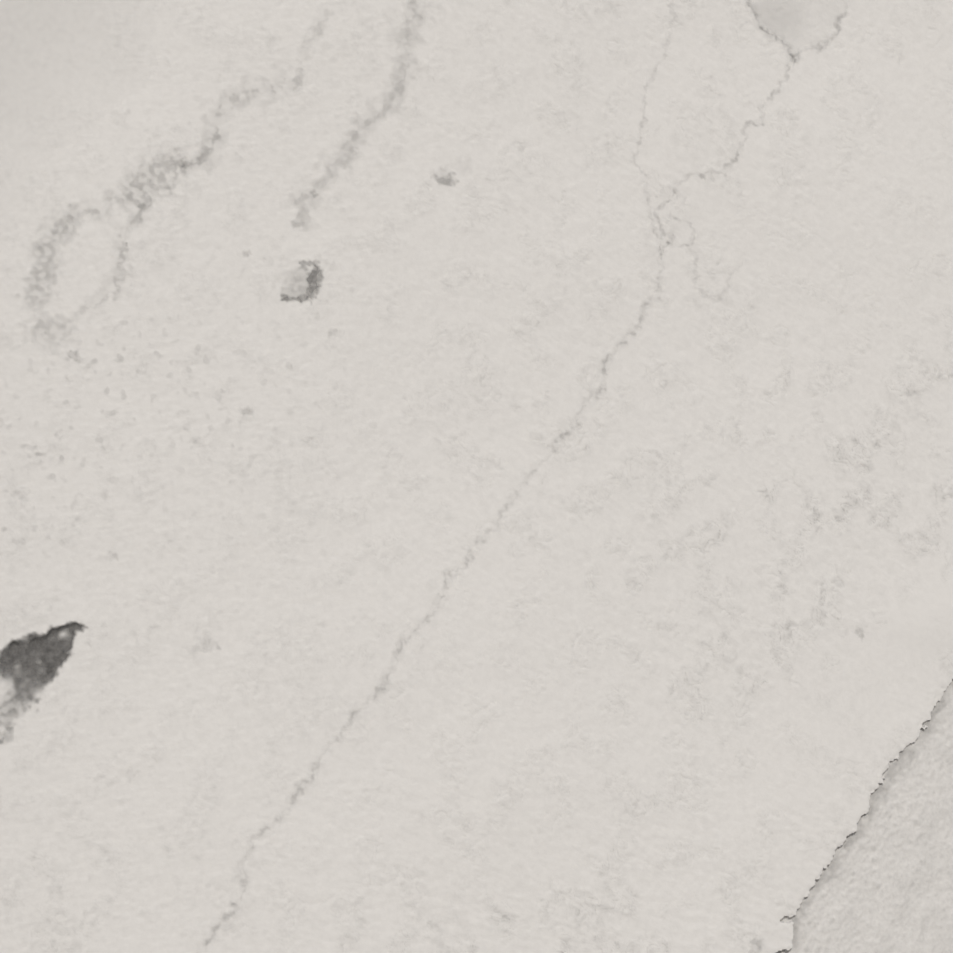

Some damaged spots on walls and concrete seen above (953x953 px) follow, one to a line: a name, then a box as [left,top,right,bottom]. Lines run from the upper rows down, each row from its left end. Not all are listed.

spalling [282,265,320,302]
spalling [0,622,83,692]
spalling [776,679,953,953]